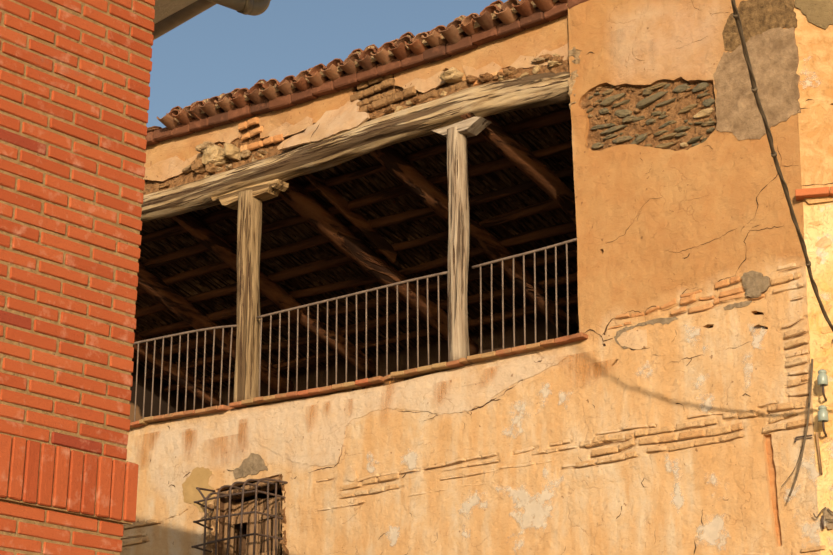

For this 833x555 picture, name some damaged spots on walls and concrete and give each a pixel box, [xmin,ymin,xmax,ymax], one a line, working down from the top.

flaking render [350,42,569,121]
flaking render [580,79,717,151]
flaking render [143,116,313,190]
crack [669,137,833,291]
crack [585,306,656,342]
crack [464,380,523,425]